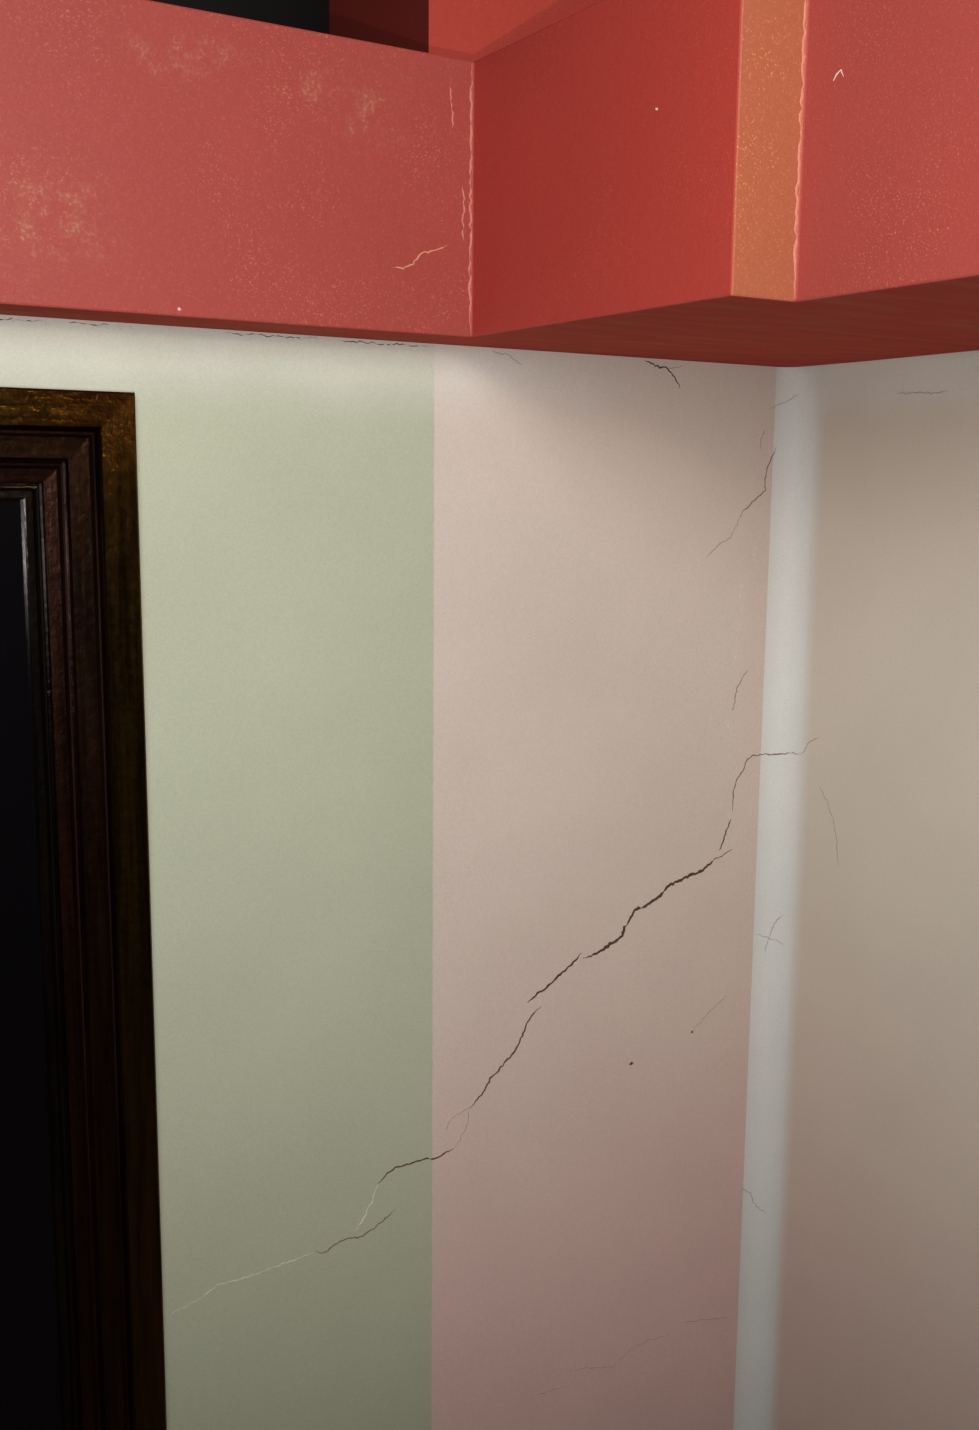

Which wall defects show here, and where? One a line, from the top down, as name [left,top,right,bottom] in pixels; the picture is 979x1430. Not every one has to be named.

crack [707,395,797,556]
crack [174,738,817,1312]